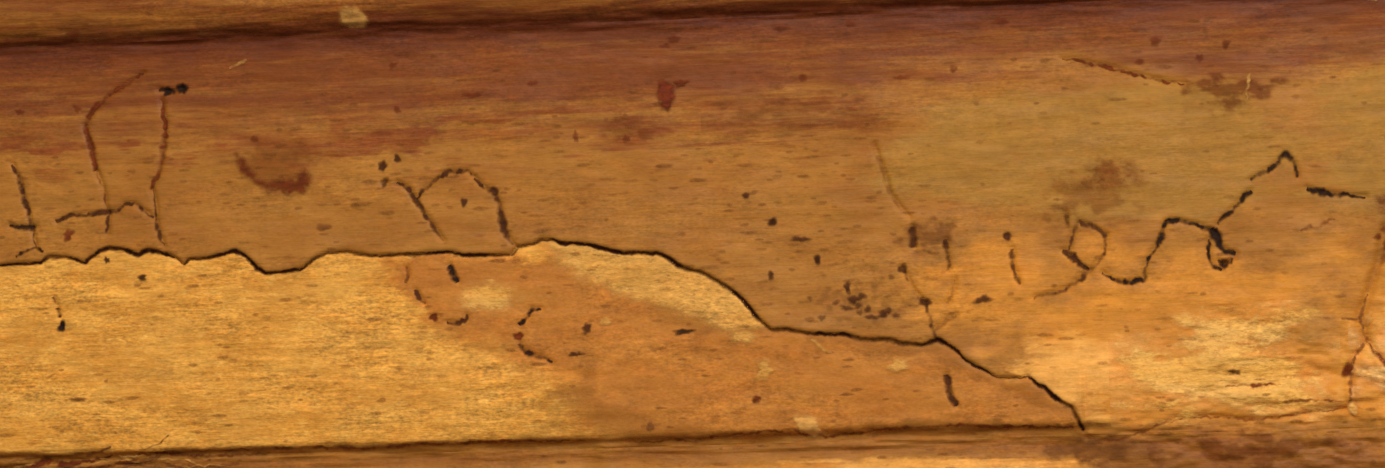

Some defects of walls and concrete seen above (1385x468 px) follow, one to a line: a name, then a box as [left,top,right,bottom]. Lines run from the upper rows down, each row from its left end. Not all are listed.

water stain [238,158,309,193]
crack [0,73,1085,431]
crack [1003,151,1365,294]
crack [1225,294,1385,415]
crack [21,435,583,468]
crack [639,426,910,443]